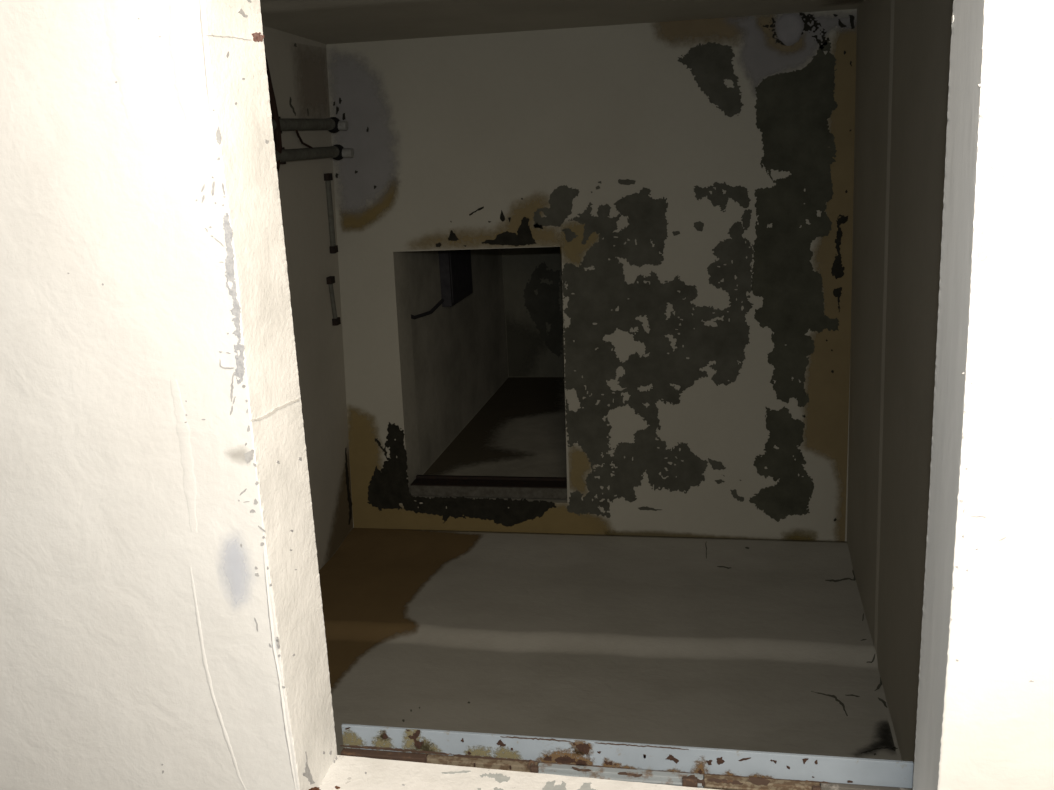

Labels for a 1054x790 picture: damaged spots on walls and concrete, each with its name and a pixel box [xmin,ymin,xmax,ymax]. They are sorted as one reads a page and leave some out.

leakage [341,179,397,230]
peeling [523,15,851,522]
spalling [196,176,257,467]
peeling [542,780,596,790]
corrosion [340,727,829,790]